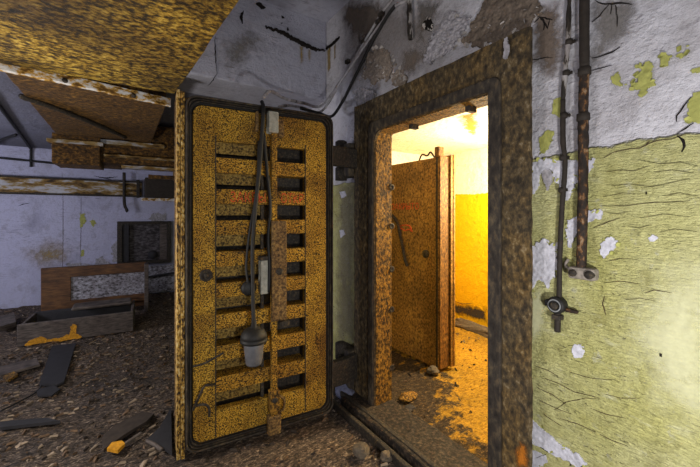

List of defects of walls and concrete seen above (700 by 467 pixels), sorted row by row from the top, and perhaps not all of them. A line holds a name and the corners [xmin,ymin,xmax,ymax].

spalling [422,0,543,65]
crack [592,0,632,24]
peeling [611,45,690,97]
peeling [532,130,578,200]
crack [594,97,695,232]
peeling [588,209,603,223]
peeling [532,214,577,292]
peeling [598,235,621,260]
crack [602,281,670,315]
peeling [572,344,585,358]
crack [536,366,635,446]
peeling [532,420,587,467]